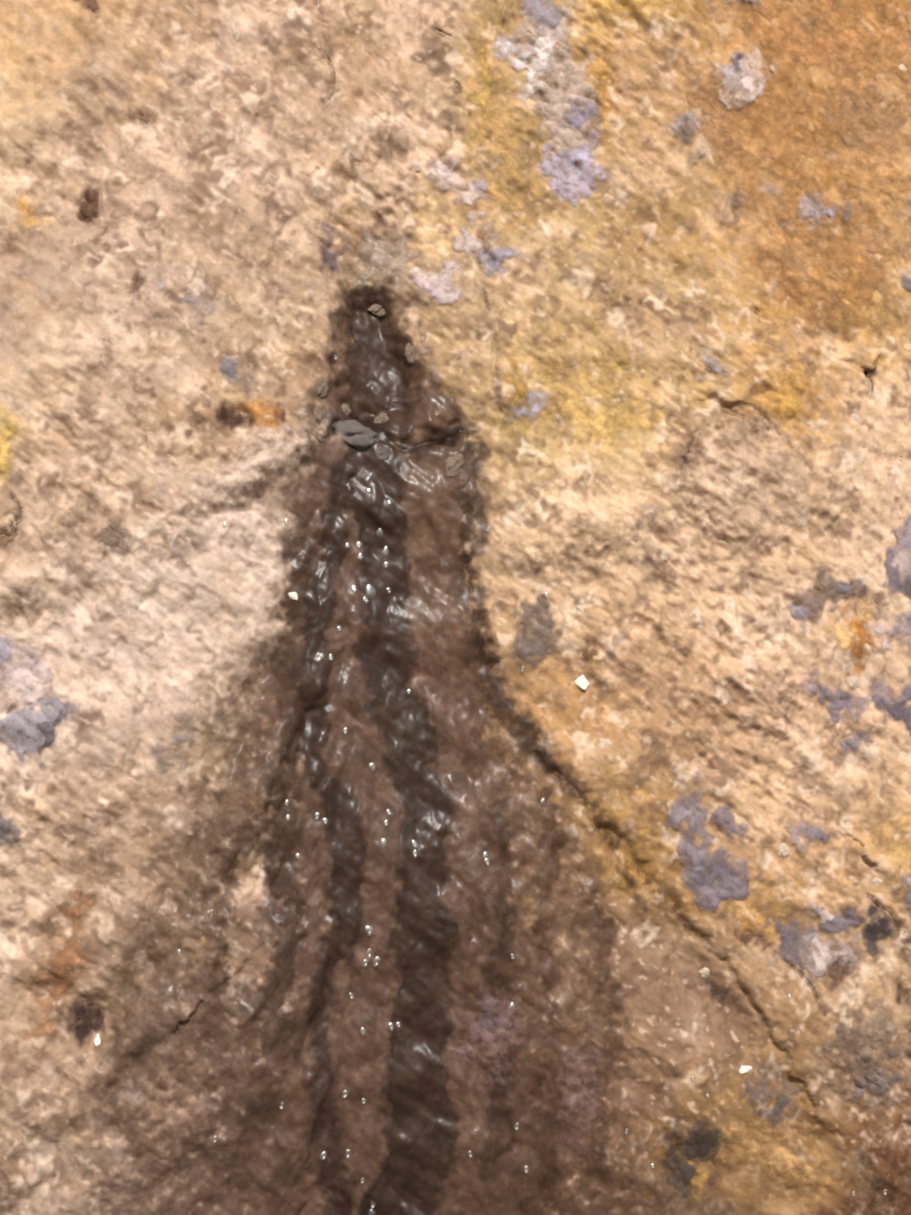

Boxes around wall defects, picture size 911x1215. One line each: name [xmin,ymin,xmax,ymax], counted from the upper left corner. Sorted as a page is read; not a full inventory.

damp [93,280,679,1215]
damp [687,1161,708,1190]
damp [721,1109,839,1203]